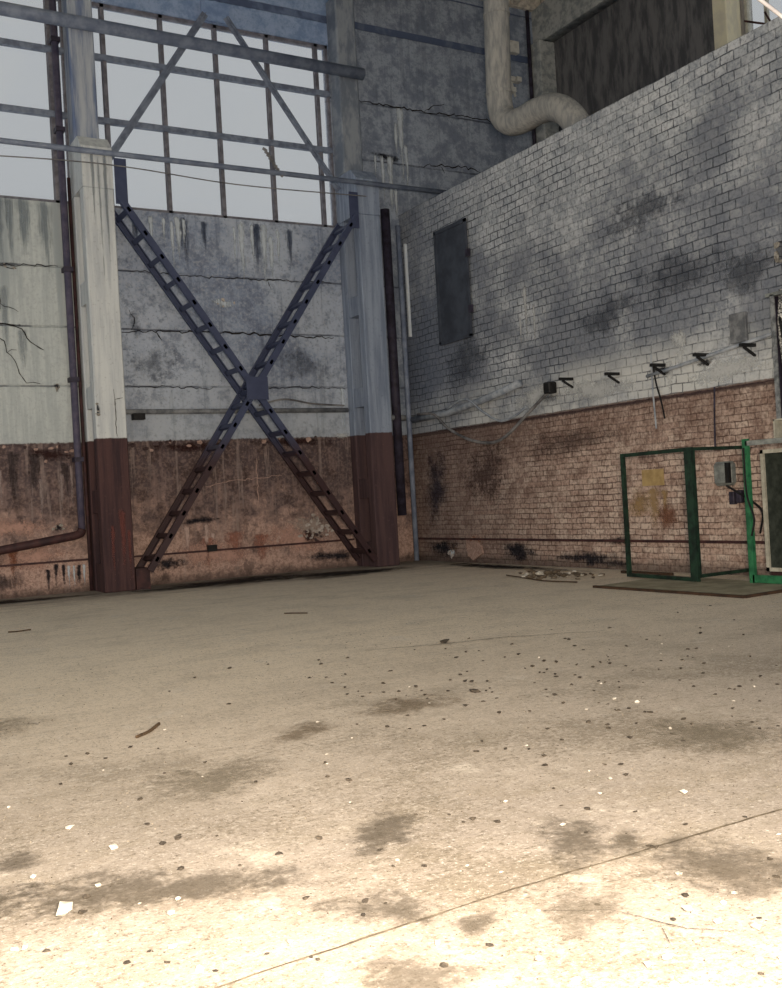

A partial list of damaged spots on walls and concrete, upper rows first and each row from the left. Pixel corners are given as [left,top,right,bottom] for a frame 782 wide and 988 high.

crack [359,100,491,122]
damp [0,200,28,240]
crack [1,262,56,270]
damp [41,204,49,257]
damp [148,217,188,260]
damp [233,223,292,277]
crack [0,299,43,384]